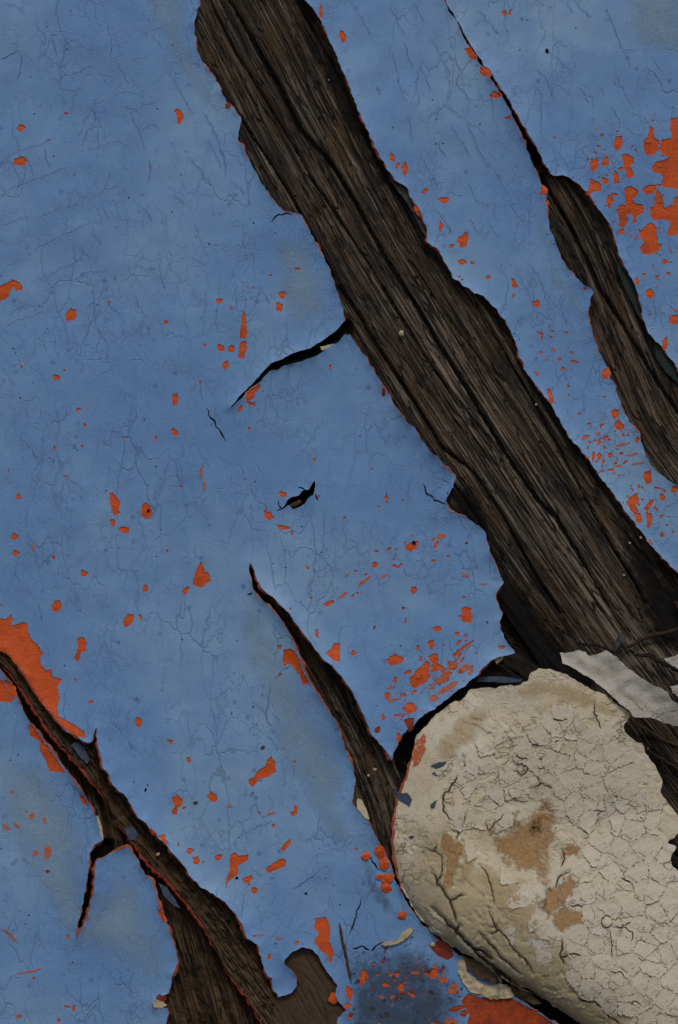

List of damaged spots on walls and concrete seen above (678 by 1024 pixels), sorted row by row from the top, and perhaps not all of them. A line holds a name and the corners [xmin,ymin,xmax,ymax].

crack [206,0,678,627]
peeling [194,0,678,789]
peeling [182,562,211,595]
spalling [0,604,85,739]
peeling [29,723,65,773]
peeling [583,681,678,815]
peeling [215,853,258,893]
peeling [266,839,291,873]
spalling [272,883,580,1024]
crack [422,719,566,994]
crack [556,848,642,1024]
peeling [668,834,678,870]